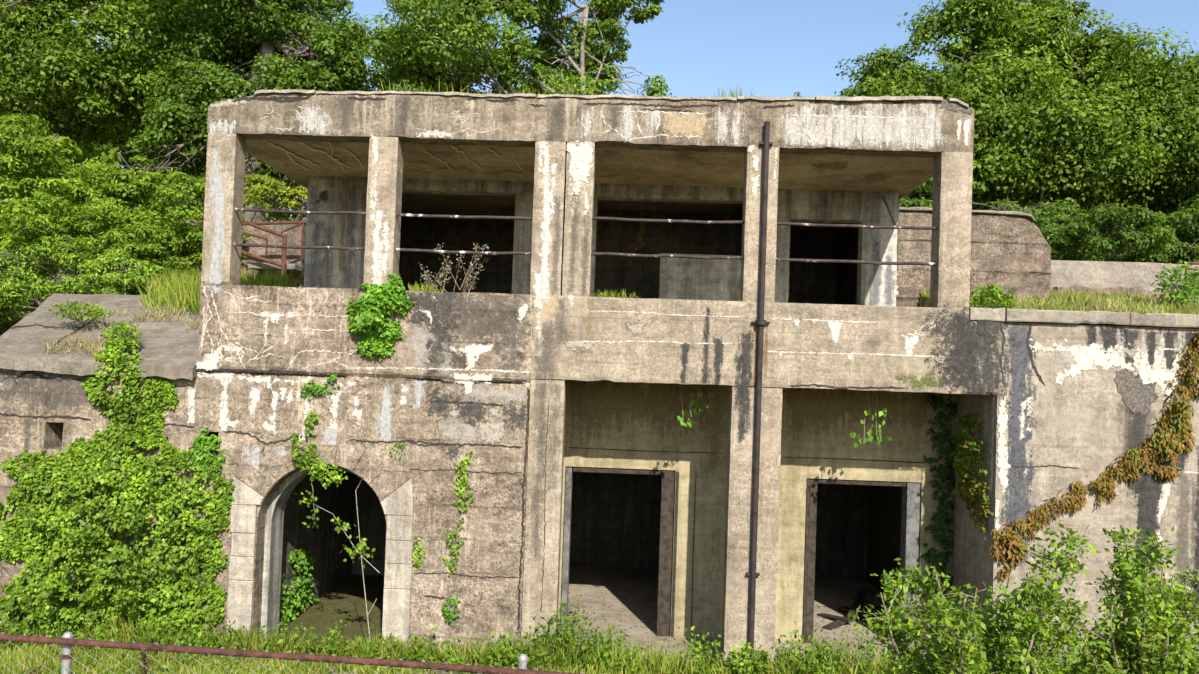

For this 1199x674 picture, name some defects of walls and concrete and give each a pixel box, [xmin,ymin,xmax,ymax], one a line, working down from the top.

peeling [566,140,593,225]
spalling [437,335,531,445]
water stain [567,308,753,472]
rust [754,326,768,385]
peeling [1029,338,1183,416]
water stain [1085,325,1196,370]
crack [196,283,741,638]
water stain [1126,408,1199,611]